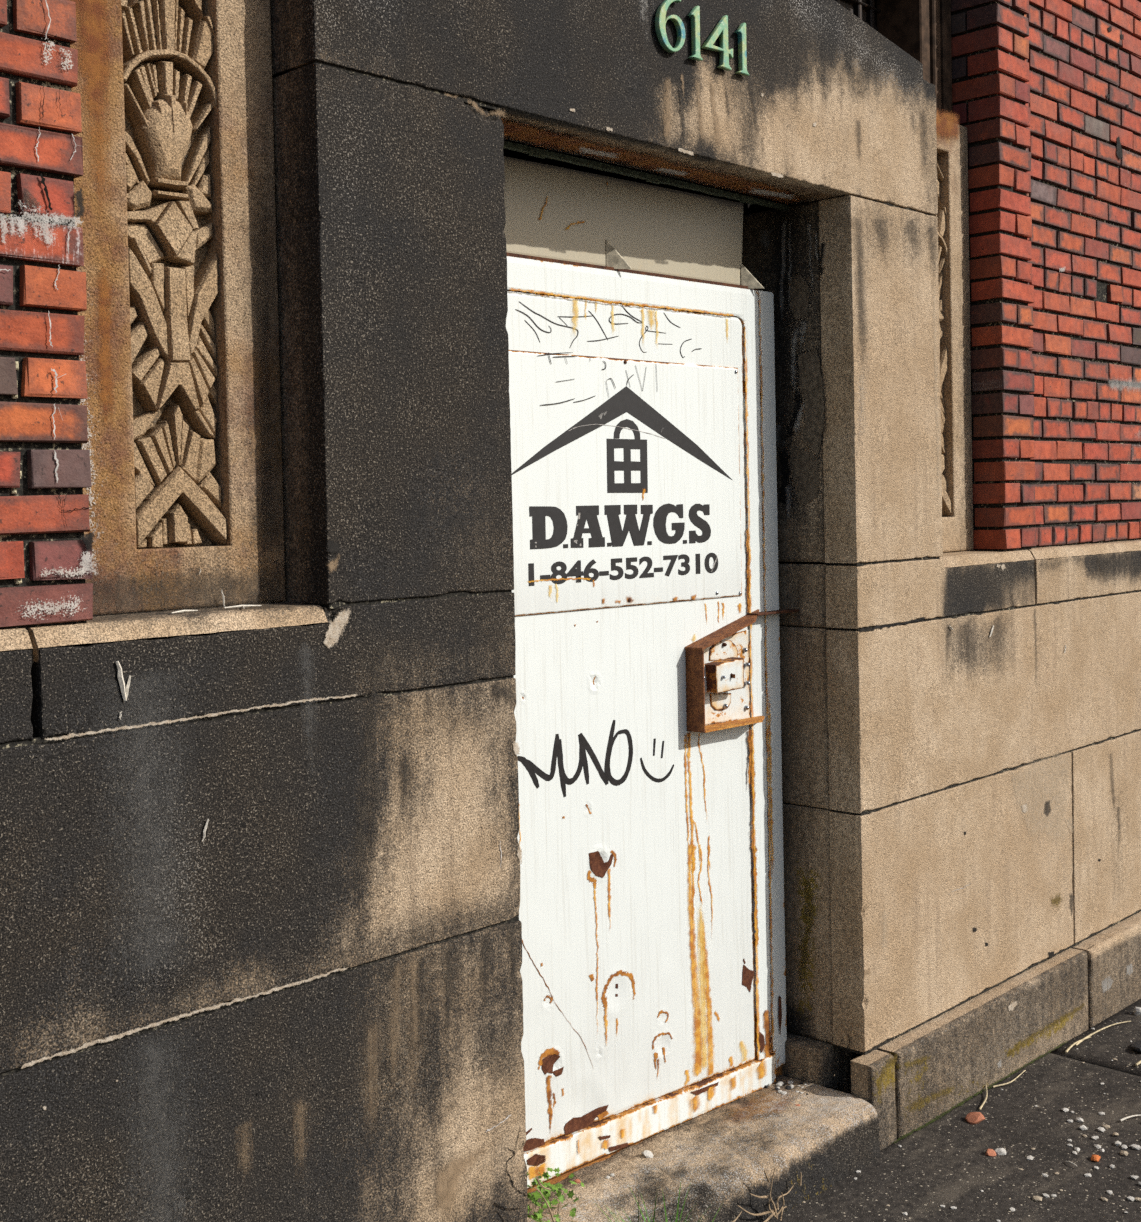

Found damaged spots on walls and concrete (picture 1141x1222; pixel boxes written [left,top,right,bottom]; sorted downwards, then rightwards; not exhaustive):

corrosion [511,288,734,340]
spalling [324,608,351,648]
corrosion [673,300,777,1112]
corrosion [589,868,636,1041]
corrosion [652,1010,672,1077]
corrosion [546,1075,564,1129]
corrosion [528,1163,545,1179]